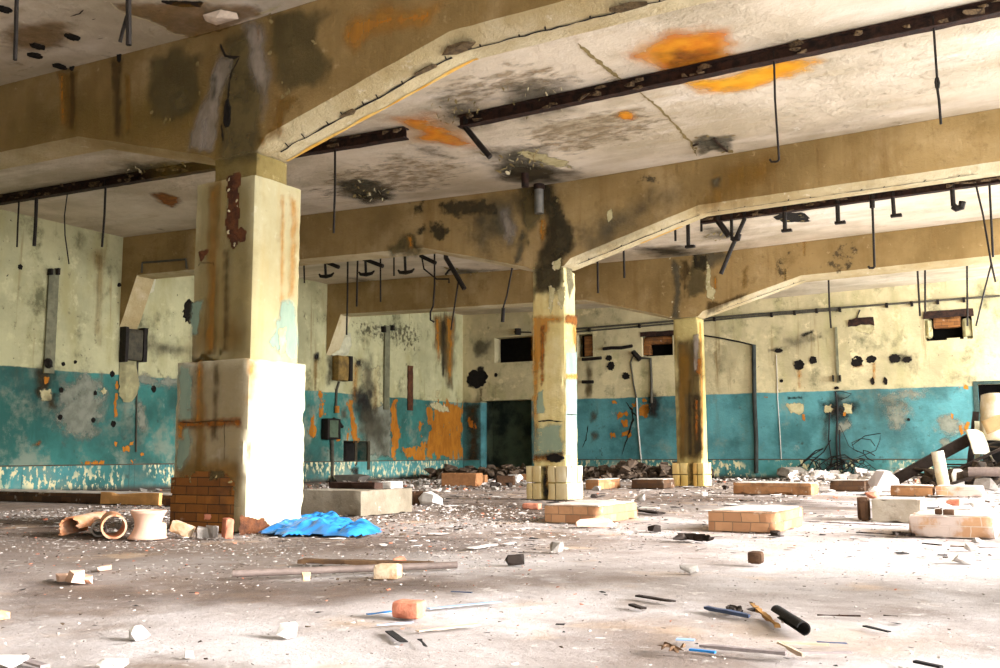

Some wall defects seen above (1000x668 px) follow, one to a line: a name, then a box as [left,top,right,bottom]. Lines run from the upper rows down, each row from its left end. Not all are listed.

corrosion [962,0,1000,15]
water stain [189,22,271,161]
corrosion [286,58,478,161]
crack [641,93,697,156]
corrosion [633,32,816,92]
spalling [225,172,247,249]
peeling [315,157,456,202]
water stain [439,151,576,293]
water stain [354,360,383,410]
peeling [336,390,477,460]
corrosion [533,315,577,417]
peeling [610,398,650,439]